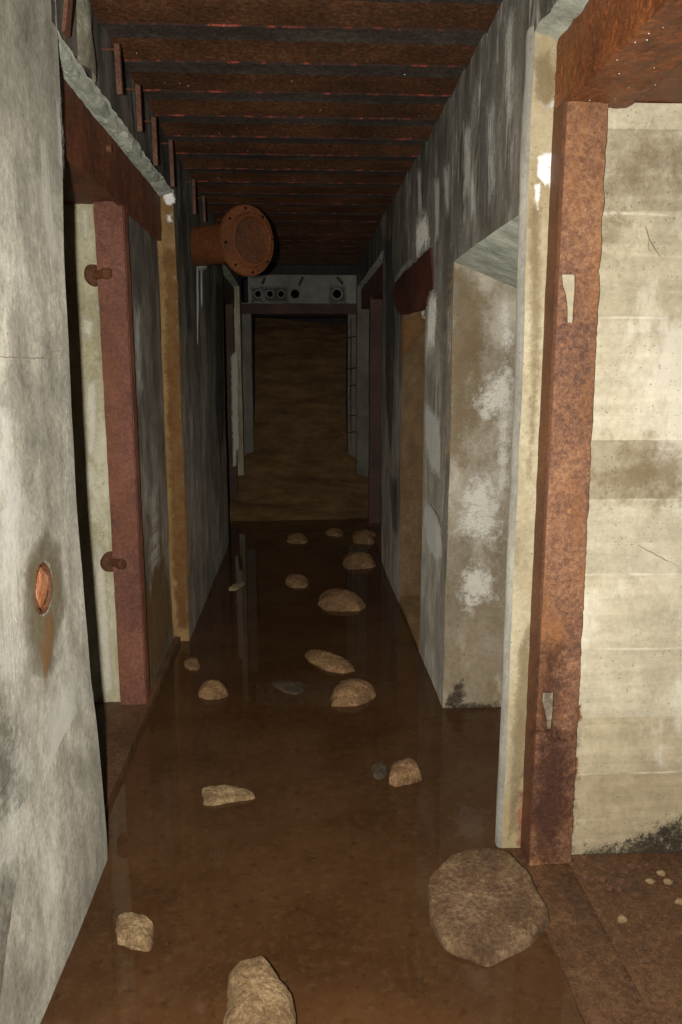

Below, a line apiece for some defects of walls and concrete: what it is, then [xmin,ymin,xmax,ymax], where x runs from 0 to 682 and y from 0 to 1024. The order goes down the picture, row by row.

water stain [534,153,551,210]
water stain [495,300,515,351]
water stain [452,365,515,549]
corrosion [27,541,63,673]
water stain [455,559,499,613]
water stain [446,684,499,709]
water stain [584,817,682,855]